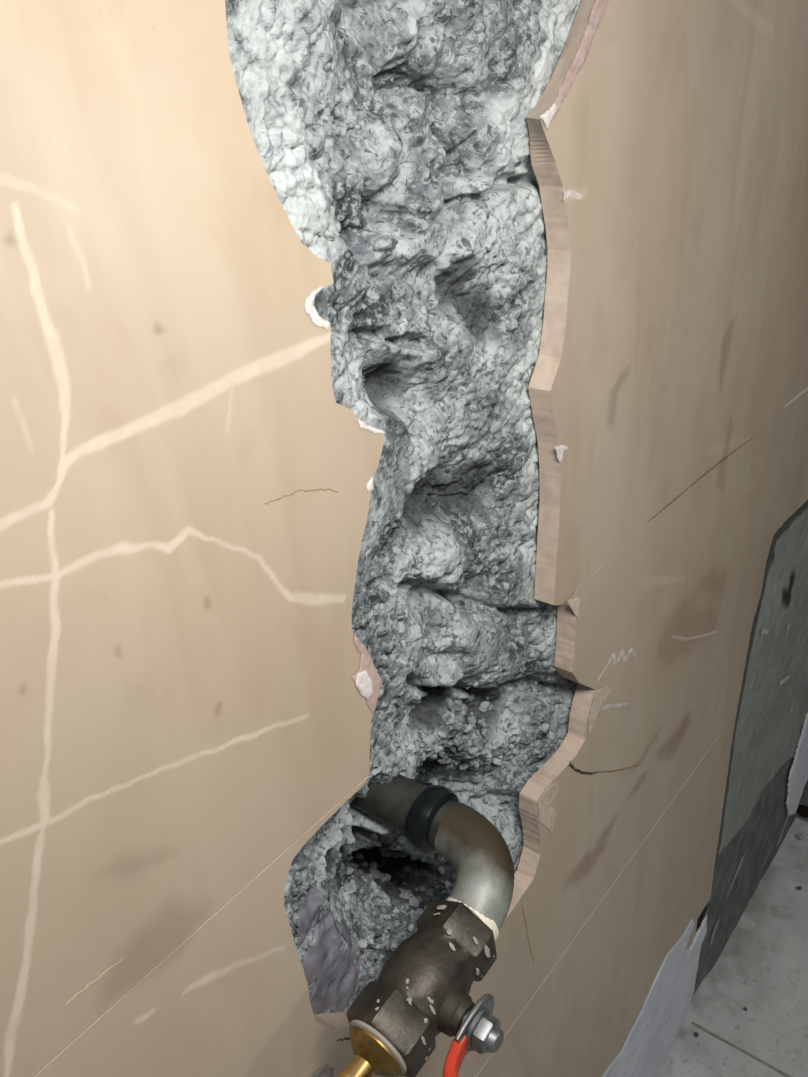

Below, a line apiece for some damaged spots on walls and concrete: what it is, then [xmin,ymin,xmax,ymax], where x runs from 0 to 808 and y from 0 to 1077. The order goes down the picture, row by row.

crack [265,488,339,505]
spalling [225,0,608,1015]
crack [568,760,638,775]